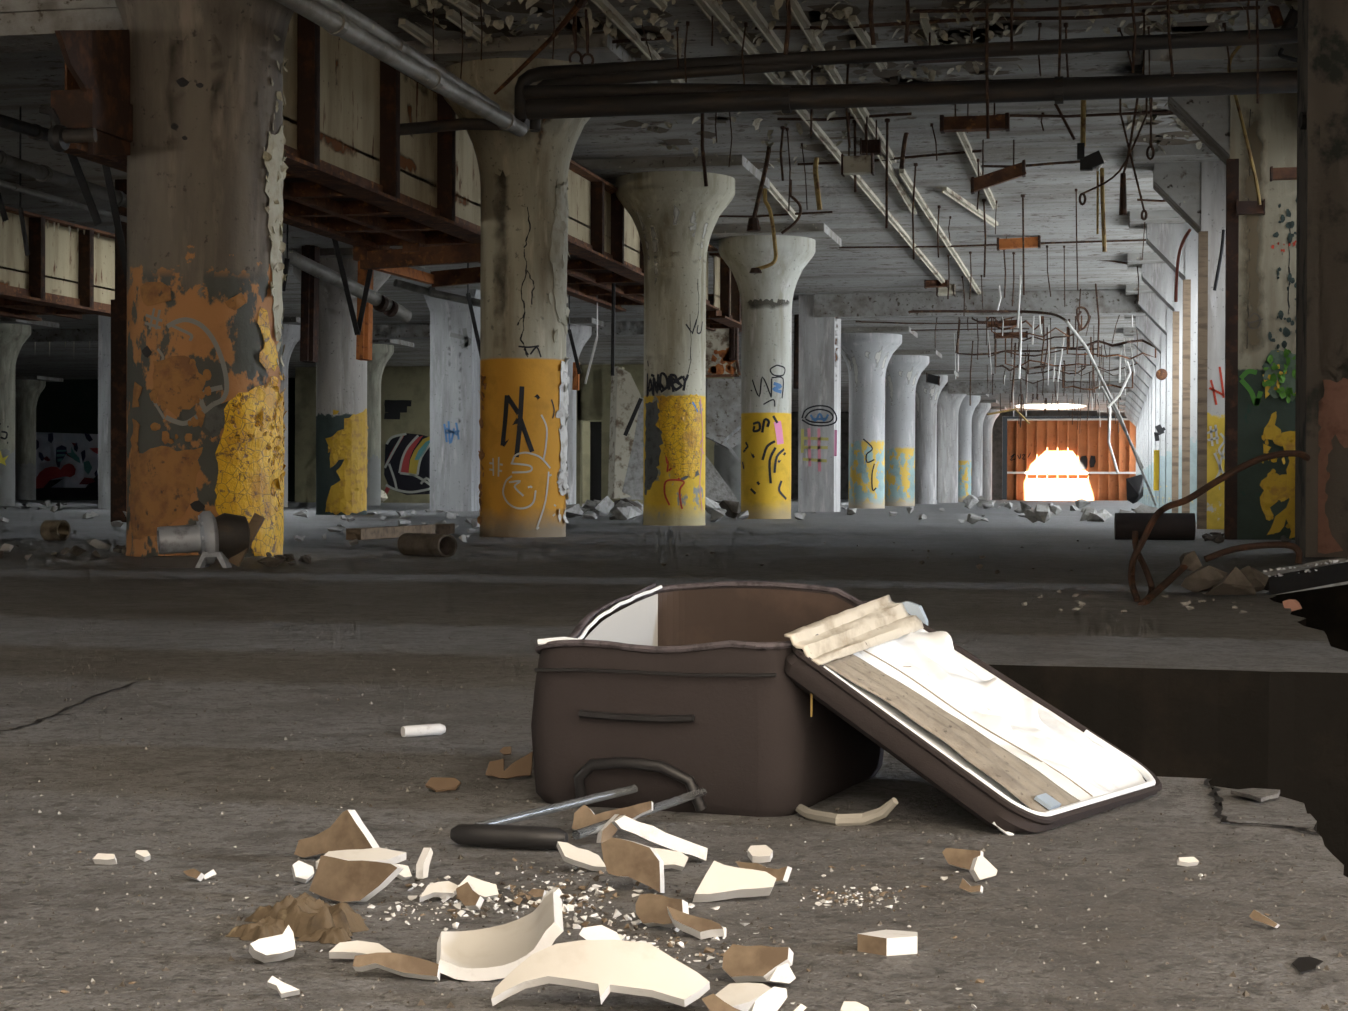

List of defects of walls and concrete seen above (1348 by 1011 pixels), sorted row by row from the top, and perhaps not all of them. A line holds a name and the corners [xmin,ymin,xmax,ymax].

peeling [130,57,289,557]
crack [517,207,535,357]
peeling [1271,197,1297,300]
peeling [325,408,369,515]
spalling [384,400,412,419]
peeling [644,394,701,495]
spalling [1128,310,1348,605]
spalling [1292,957,1323,973]